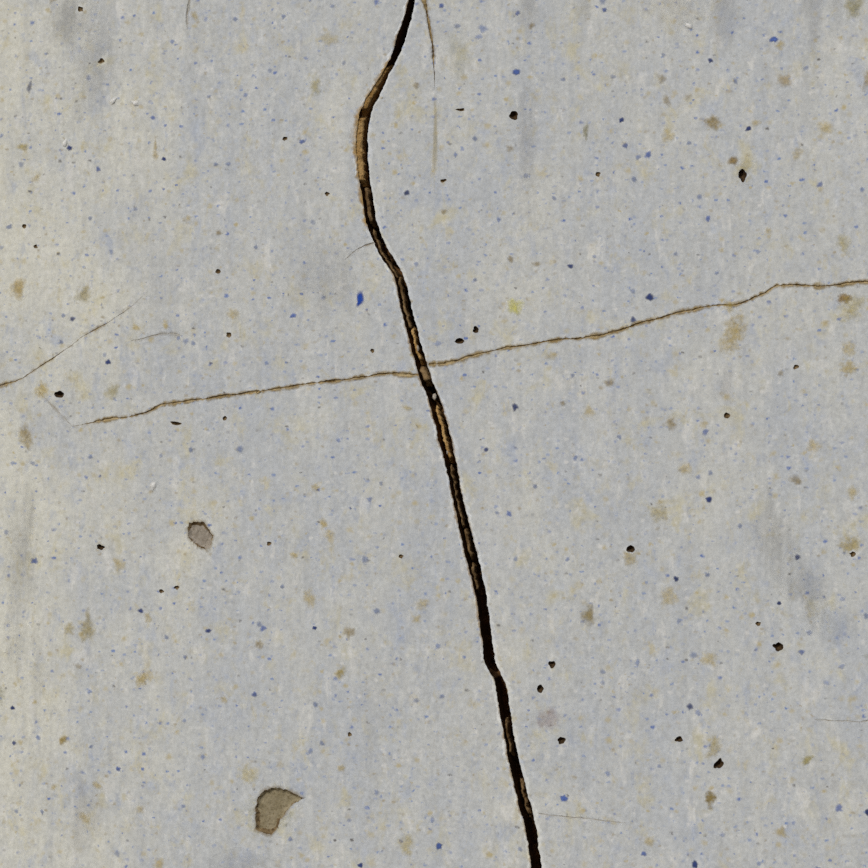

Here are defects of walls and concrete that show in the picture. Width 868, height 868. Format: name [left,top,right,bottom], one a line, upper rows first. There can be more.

crack [0,304,134,387]
crack [428,280,868,367]
crack [82,0,622,868]
hole [188,522,213,550]
spalling [255,788,303,835]